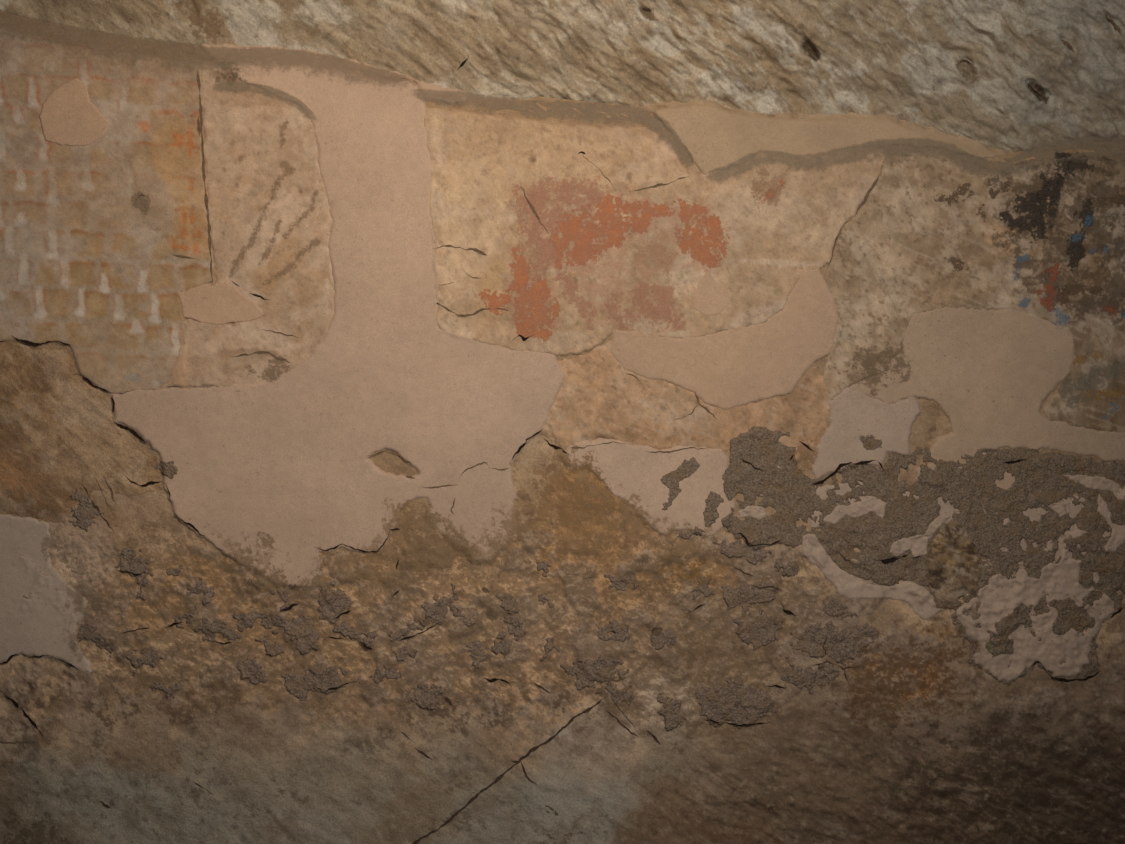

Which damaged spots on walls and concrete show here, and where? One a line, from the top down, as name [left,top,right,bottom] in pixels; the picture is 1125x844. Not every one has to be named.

crack [0,336,70,346]
spalling [0,342,178,532]
crack [76,374,151,447]
crack [82,475,212,543]
spalling [538,340,1125,694]
crack [0,654,79,744]
spalling [75,619,186,698]
spalling [115,548,527,701]
spalling [540,637,635,705]
spalling [654,692,687,731]
spalling [695,677,777,729]
crack [412,668,660,844]